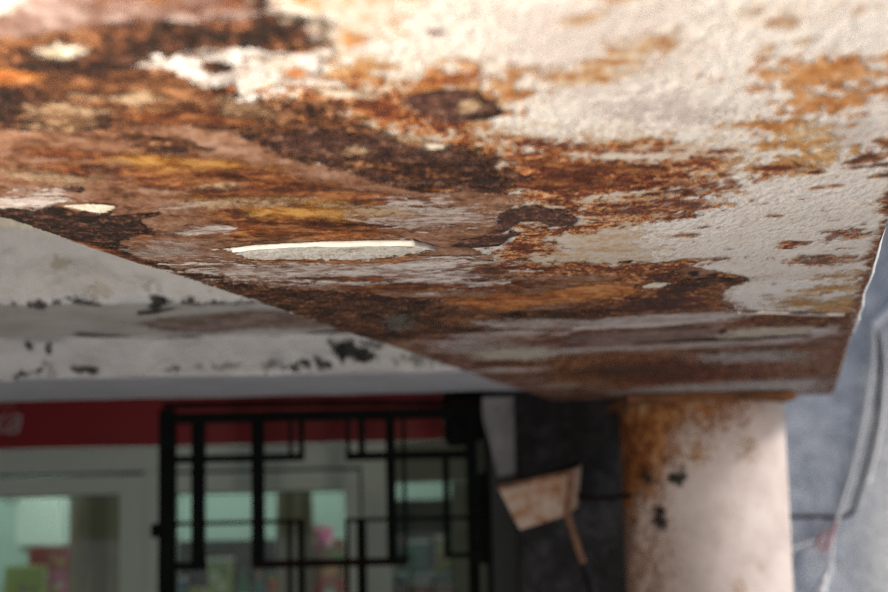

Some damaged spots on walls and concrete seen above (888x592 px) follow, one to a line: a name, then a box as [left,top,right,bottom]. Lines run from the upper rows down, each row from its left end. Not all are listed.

peeling [0,125,855,400]
corrosion [0,0,888,400]
corrosion [619,401,758,530]